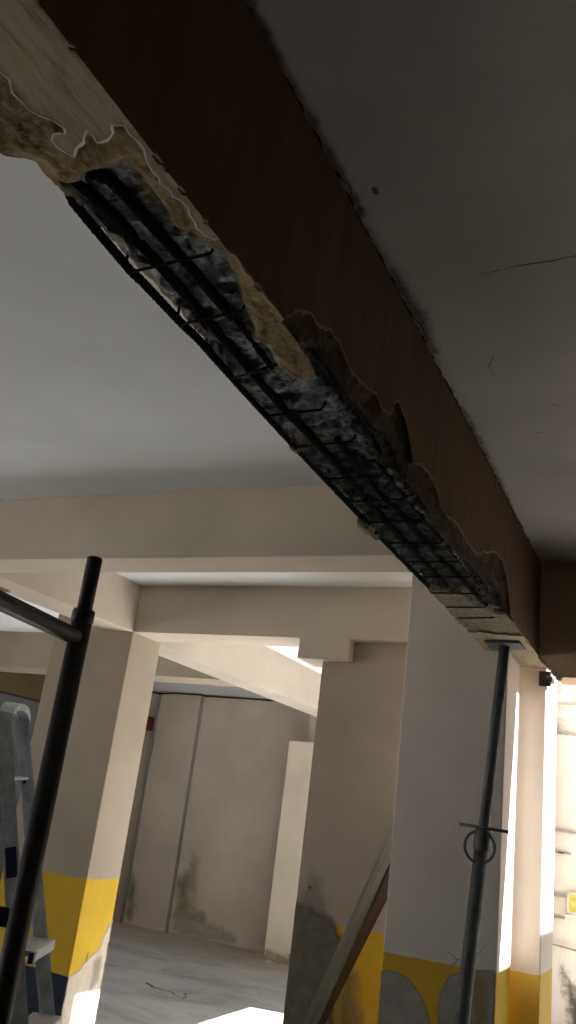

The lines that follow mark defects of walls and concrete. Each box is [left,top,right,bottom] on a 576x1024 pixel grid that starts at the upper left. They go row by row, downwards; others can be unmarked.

spalling [0,72,523,636]
crack [270,48,539,559]
damp [264,905,341,1024]
peeling [378,971,460,1024]
peeling [469,970,495,1024]